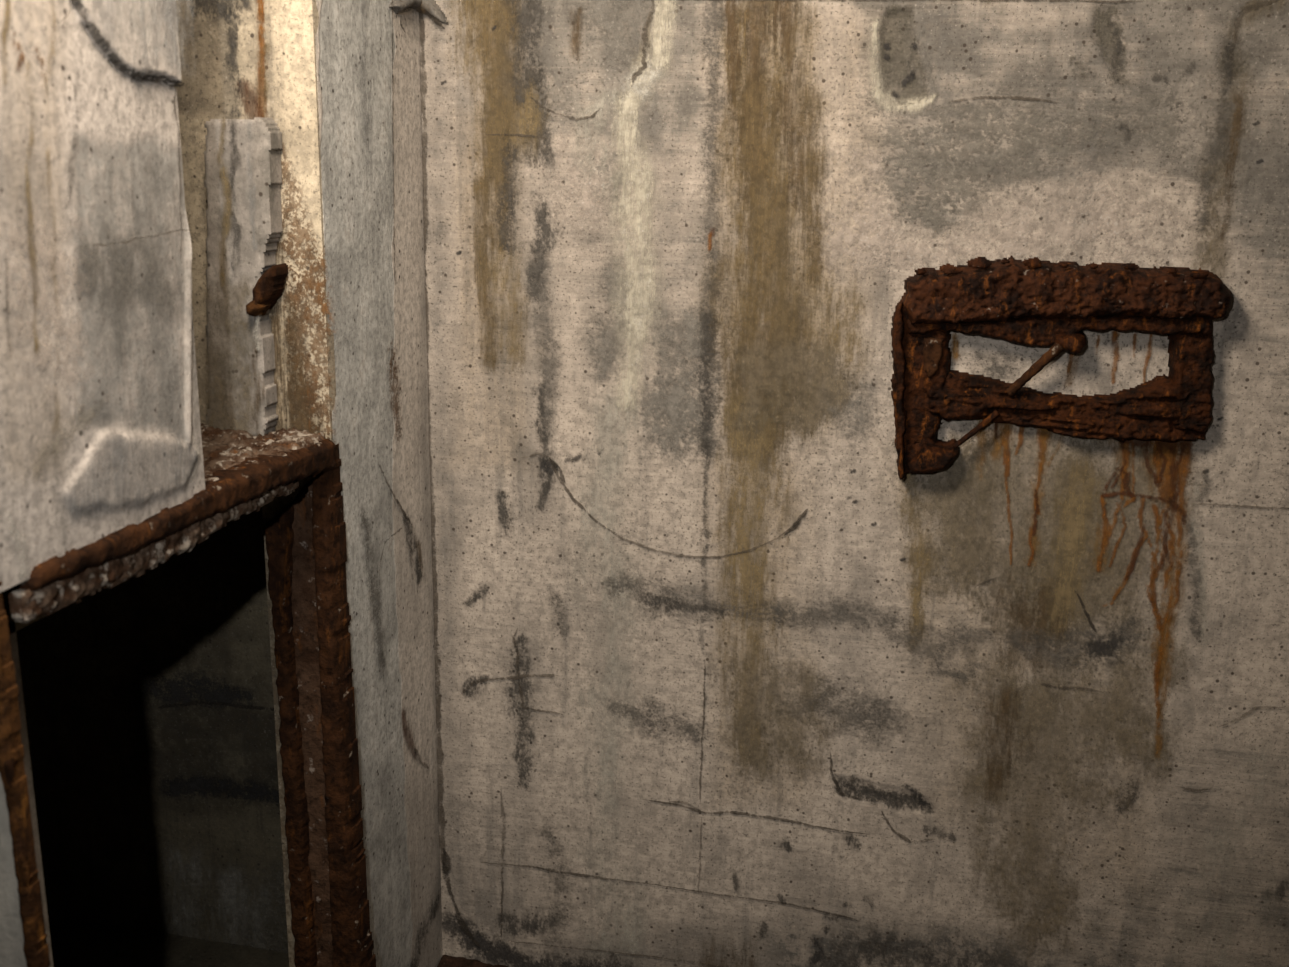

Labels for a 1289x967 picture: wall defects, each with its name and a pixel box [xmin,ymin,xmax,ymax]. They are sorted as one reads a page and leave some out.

spalling [12,33,46,82]
crack [63,0,188,247]
rust [271,199,332,441]
crack [391,0,429,368]
water stain [458,0,558,511]
crack [379,447,869,947]
water stain [572,0,1182,952]
rust [915,257,1069,276]
rust [977,420,1053,566]
rust [1096,330,1152,383]
rust [1097,438,1192,757]
crack [1235,0,1282,34]